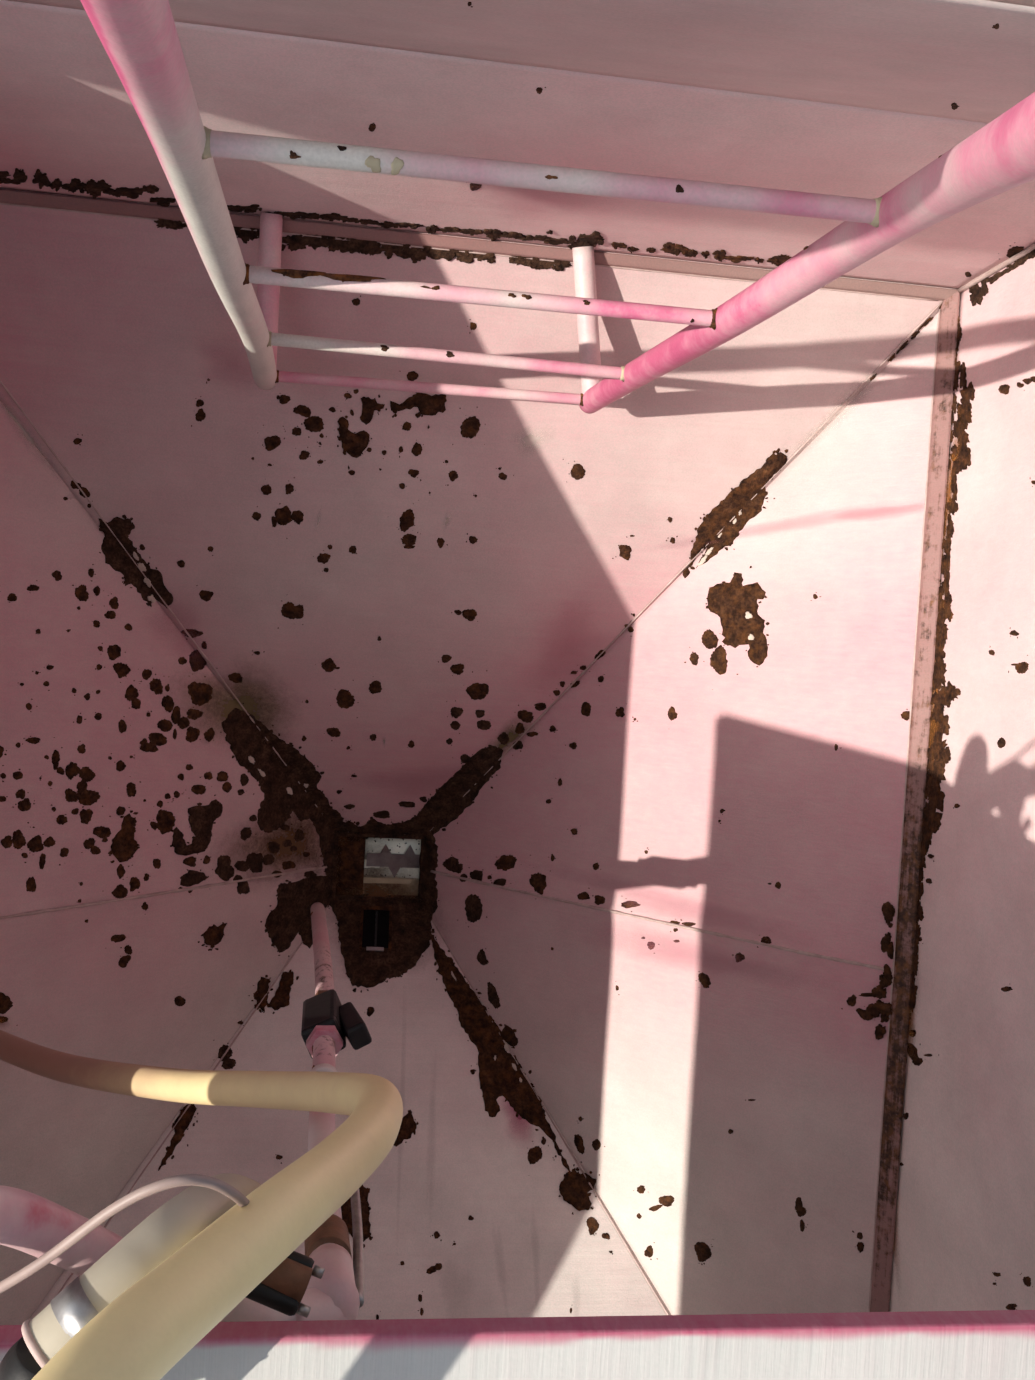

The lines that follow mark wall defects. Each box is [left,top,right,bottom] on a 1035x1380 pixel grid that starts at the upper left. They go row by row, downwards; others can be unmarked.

corrosion [0,168,187,230]
corrosion [227,204,808,271]
corrosion [870,305,942,381]
corrosion [251,371,486,494]
corrosion [666,448,788,578]
corrosion [684,566,769,690]
corrosion [906,242,1035,1066]
corrosion [0,477,613,1255]
corrosion [841,902,895,1040]